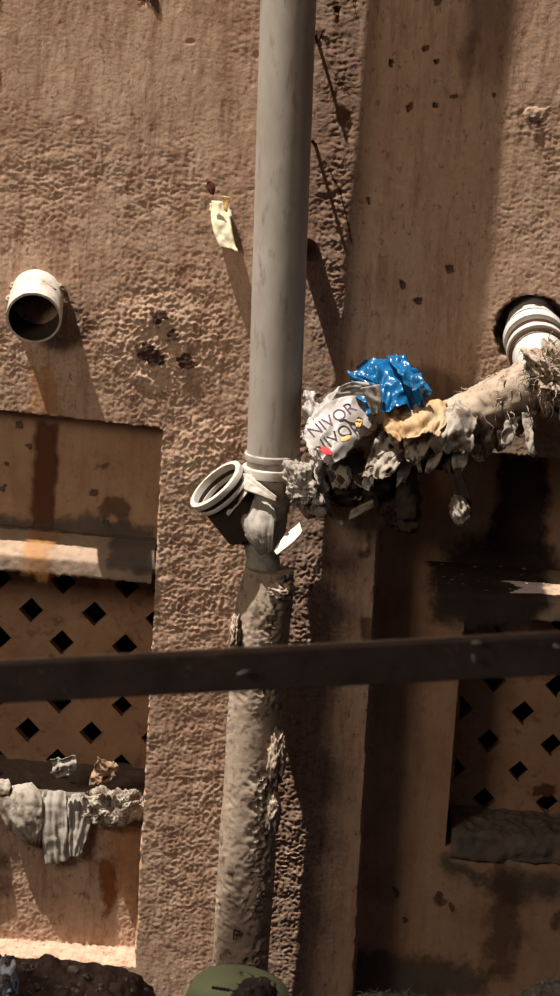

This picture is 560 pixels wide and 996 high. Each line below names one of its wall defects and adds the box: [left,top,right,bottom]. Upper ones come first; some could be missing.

corrosion [30,422,58,532]
damp [428,454,560,630]
damp [353,857,559,996]